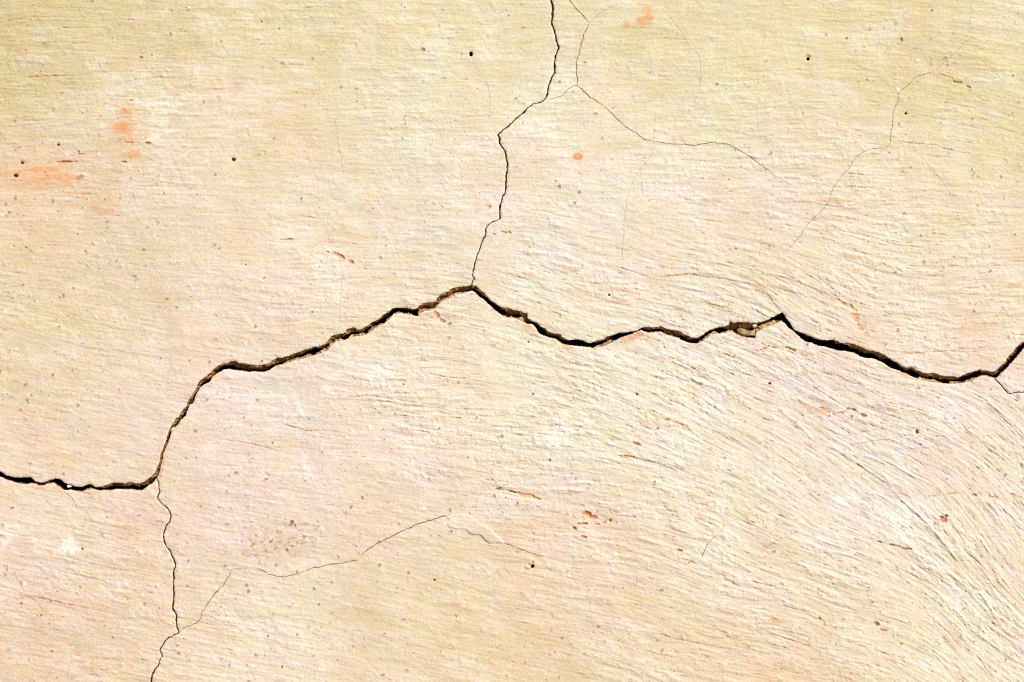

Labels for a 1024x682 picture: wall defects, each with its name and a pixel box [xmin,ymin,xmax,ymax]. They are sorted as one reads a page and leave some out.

crack [0,0,1024,495]
crack [150,479,179,682]
crack [182,568,238,630]
crack [254,514,450,591]